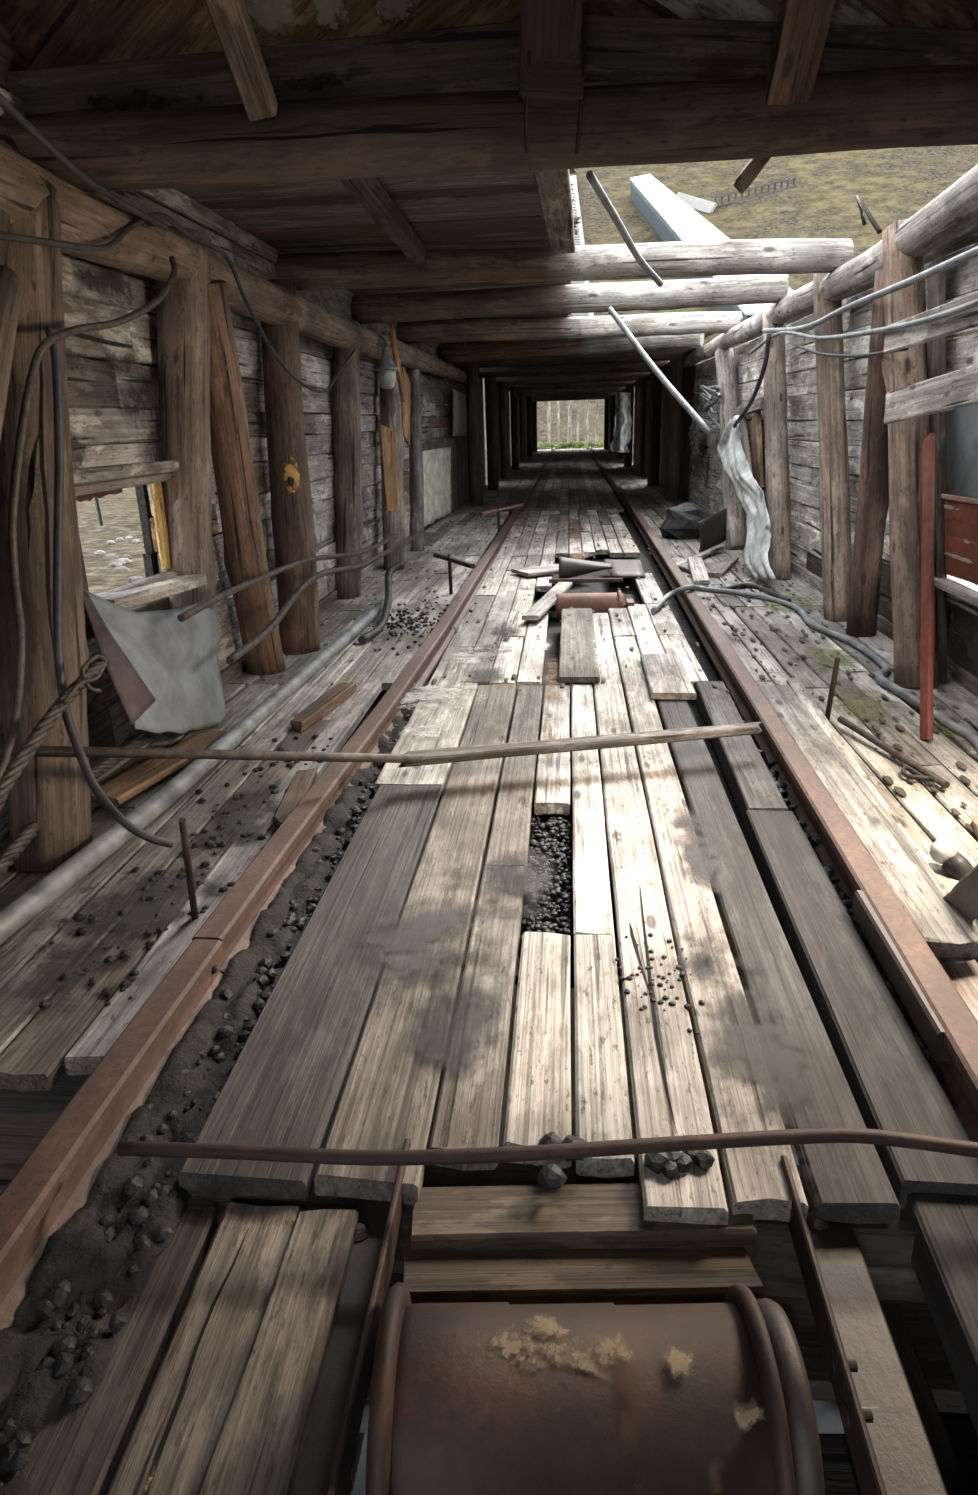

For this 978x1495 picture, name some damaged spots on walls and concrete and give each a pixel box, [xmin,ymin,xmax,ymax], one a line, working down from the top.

peeling [488,1316,633,1376]
peeling [666,1348,693,1377]
peeling [735,1398,763,1429]